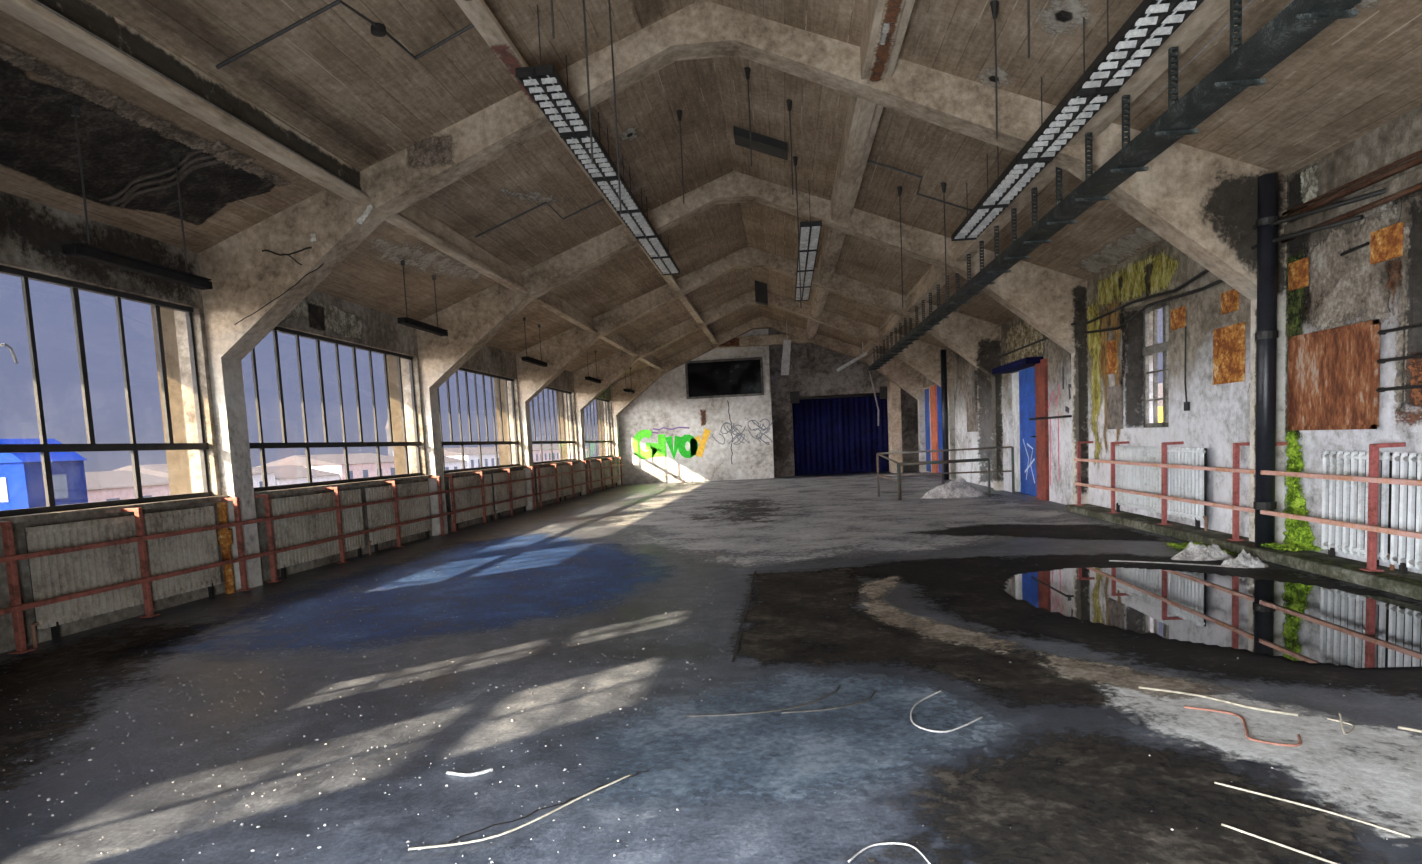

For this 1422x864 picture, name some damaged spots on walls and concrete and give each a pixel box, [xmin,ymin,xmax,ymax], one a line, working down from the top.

flaking render [0,43,290,225]
peeling [491,45,535,103]